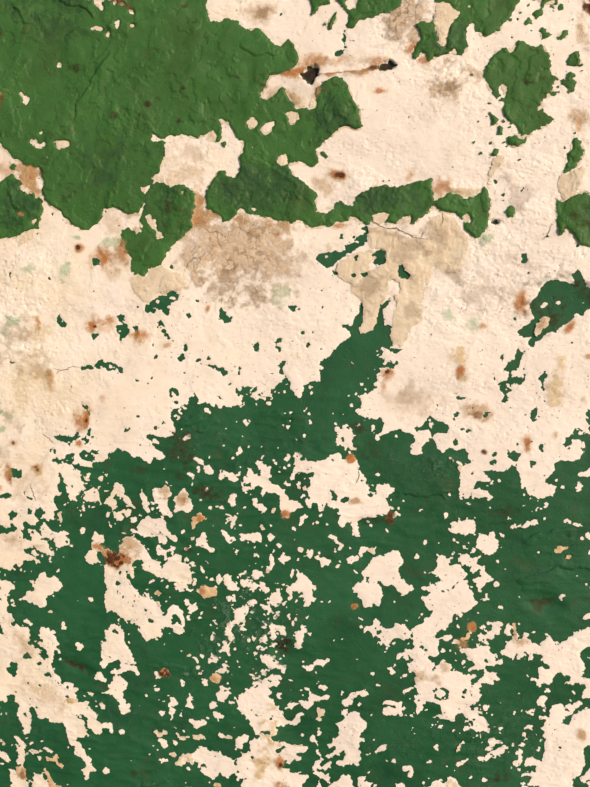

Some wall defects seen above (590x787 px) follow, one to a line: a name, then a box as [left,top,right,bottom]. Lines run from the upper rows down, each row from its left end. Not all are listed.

corrosion [281,56,335,77]
corrosion [346,57,382,74]
corrosion [330,170,347,180]
corrosion [96,239,128,266]
corrosion [74,411,89,431]
peeling [187,422,404,537]
corrosion [93,539,137,569]
peeling [260,569,316,620]
peeling [328,534,414,608]
peeling [358,512,590,787]
peeling [0,569,113,787]
peeling [310,689,369,787]